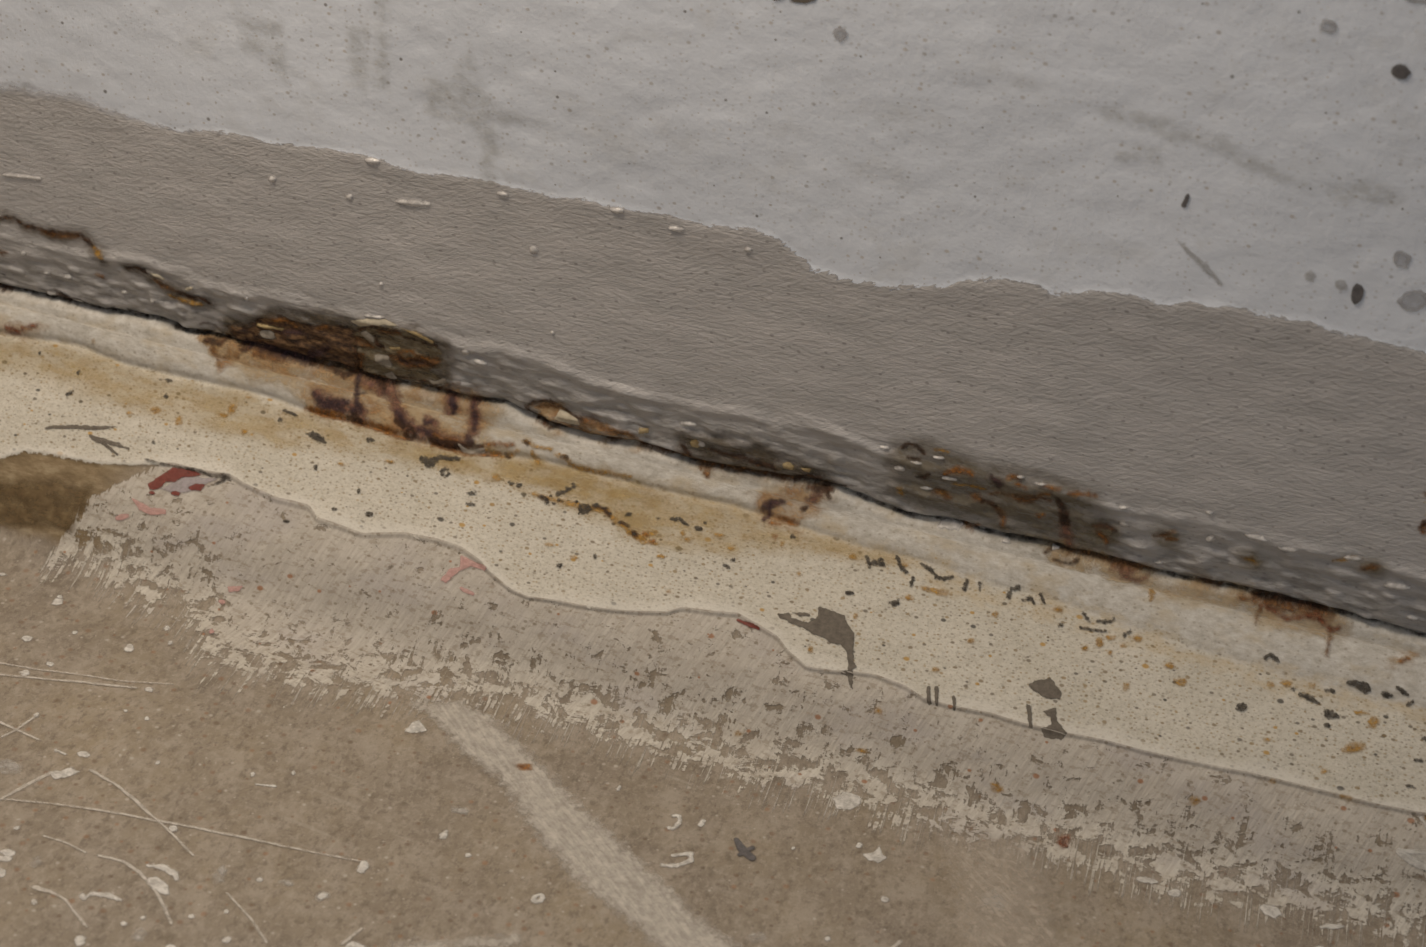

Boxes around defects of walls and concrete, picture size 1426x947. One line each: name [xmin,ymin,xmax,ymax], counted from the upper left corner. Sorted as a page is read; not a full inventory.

water stain [1391,64,1411,79]
corrosion [0,216,105,279]
corrosion [123,265,631,477]
spalling [306,431,327,444]
spalling [419,455,461,476]
corrosion [525,399,846,546]
corrosion [532,492,664,558]
corrosion [893,442,1346,654]
peeling [33,462,1426,947]